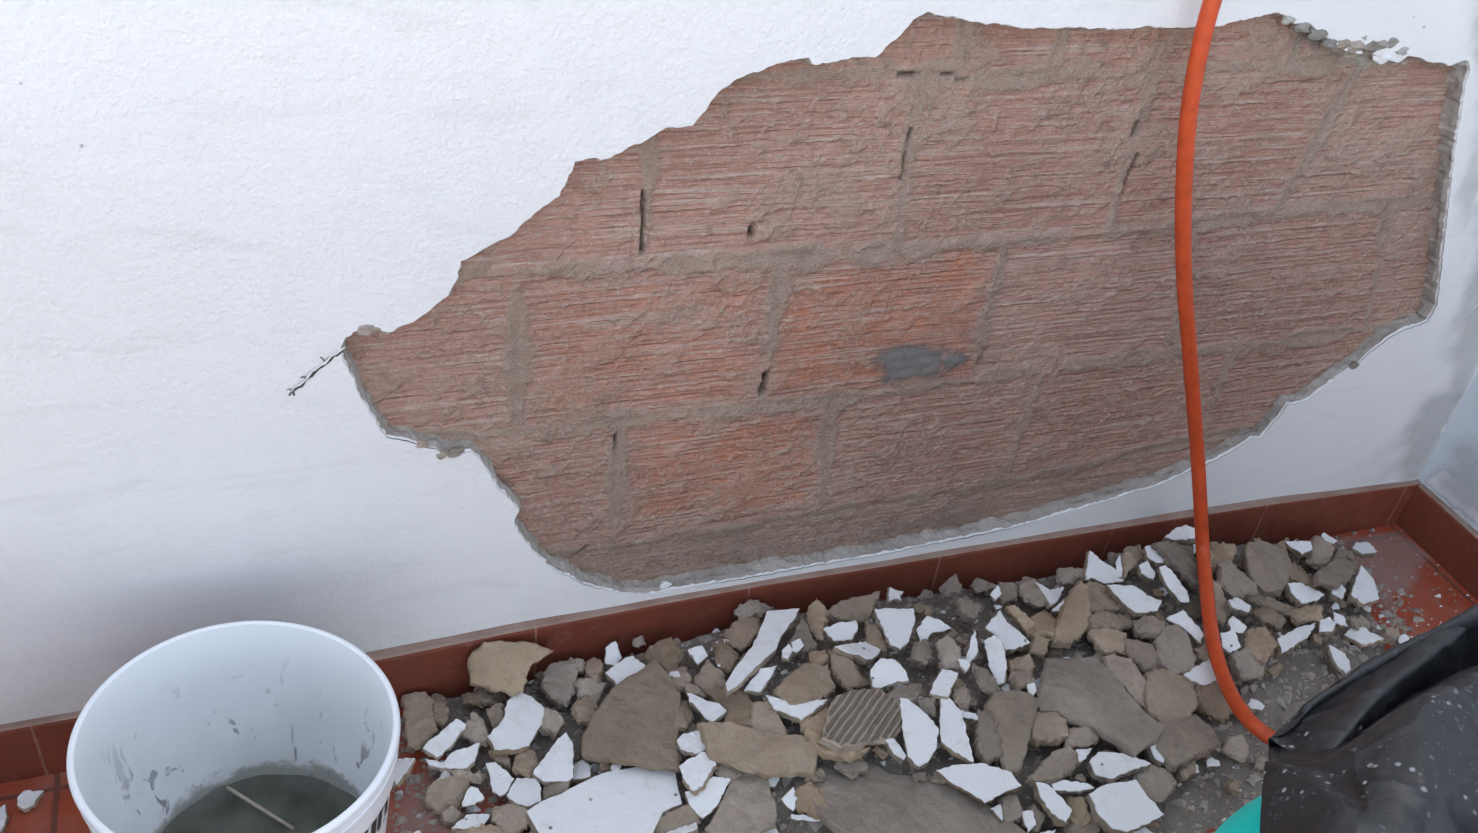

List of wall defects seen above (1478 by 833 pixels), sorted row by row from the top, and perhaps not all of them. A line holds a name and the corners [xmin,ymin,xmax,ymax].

flaking render [341,12,1469,595]